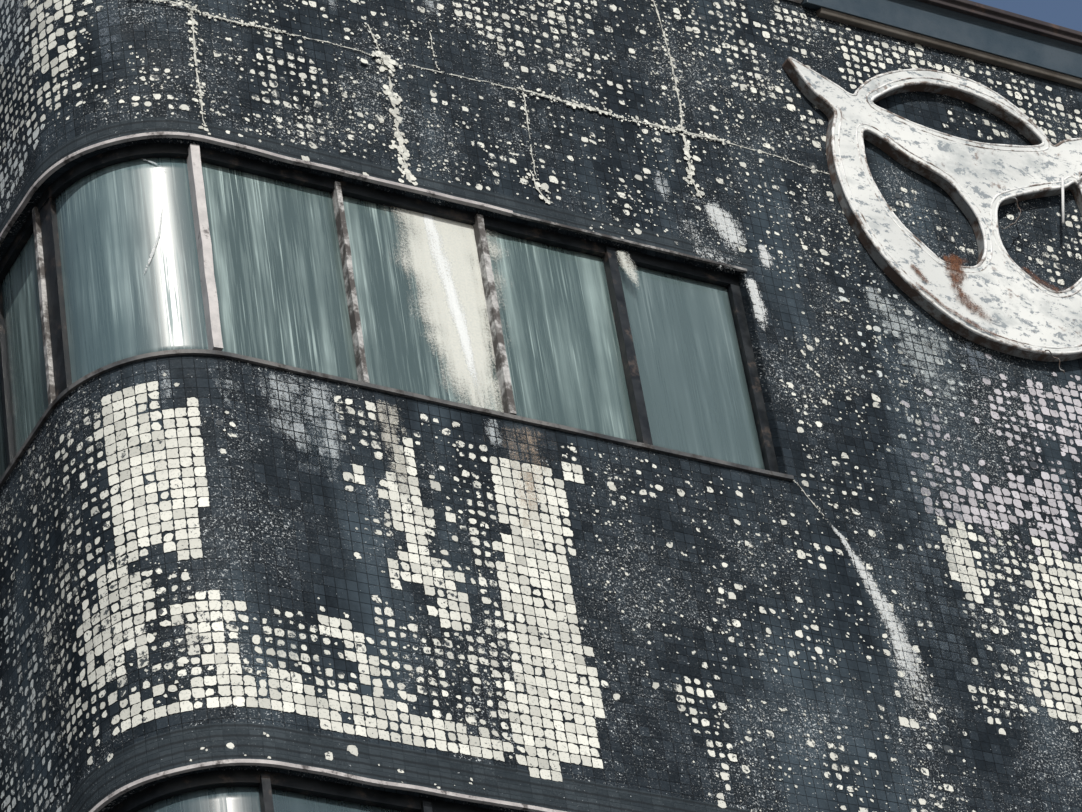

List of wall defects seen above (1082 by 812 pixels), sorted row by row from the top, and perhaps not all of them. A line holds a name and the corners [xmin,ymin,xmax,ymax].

peeling [0,0,196,212]
water stain [393,208,506,444]
peeling [0,373,976,812]
water stain [832,525,936,714]